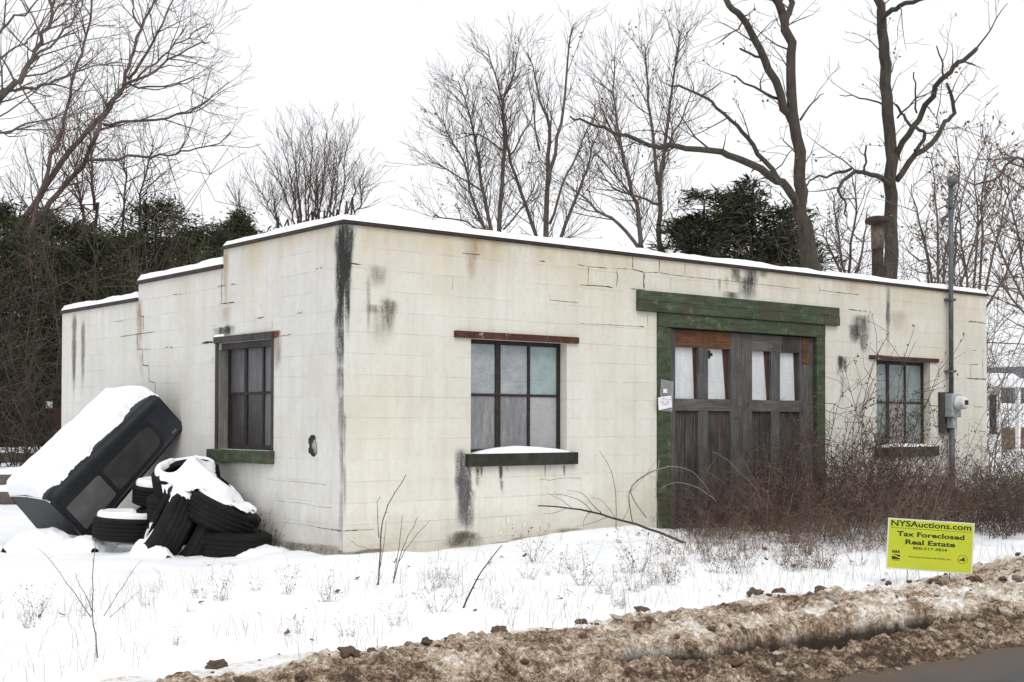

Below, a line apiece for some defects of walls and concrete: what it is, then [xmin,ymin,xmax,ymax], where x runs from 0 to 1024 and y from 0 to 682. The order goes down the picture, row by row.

damp [335,224,354,358]
damp [72,319,85,375]
crack [116,312,173,392]
damp [851,317,867,348]
spalling [308,435,317,457]
damp [449,451,483,546]